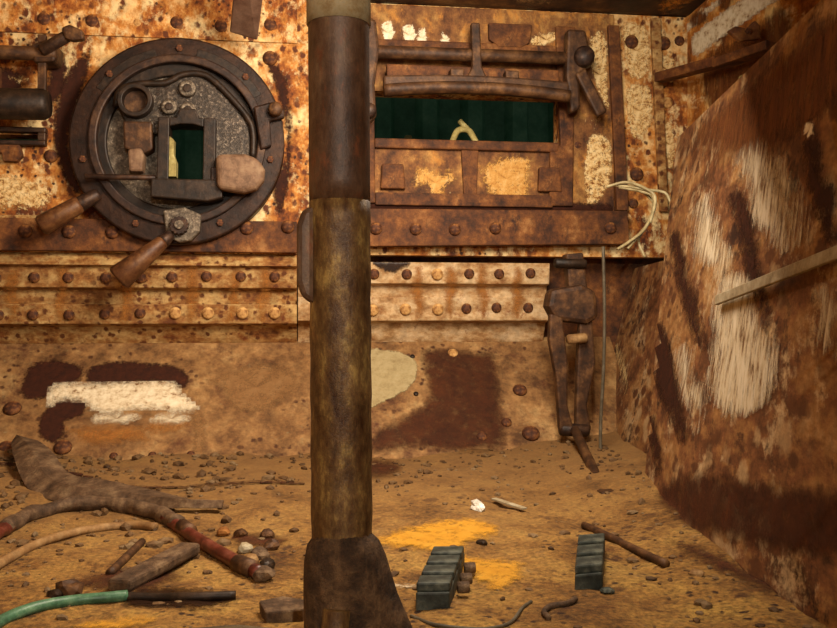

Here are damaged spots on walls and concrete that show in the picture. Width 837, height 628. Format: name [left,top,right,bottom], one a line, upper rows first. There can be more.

rust [47,48,90,195]
rust [268,65,293,213]
rust [370,203,615,211]